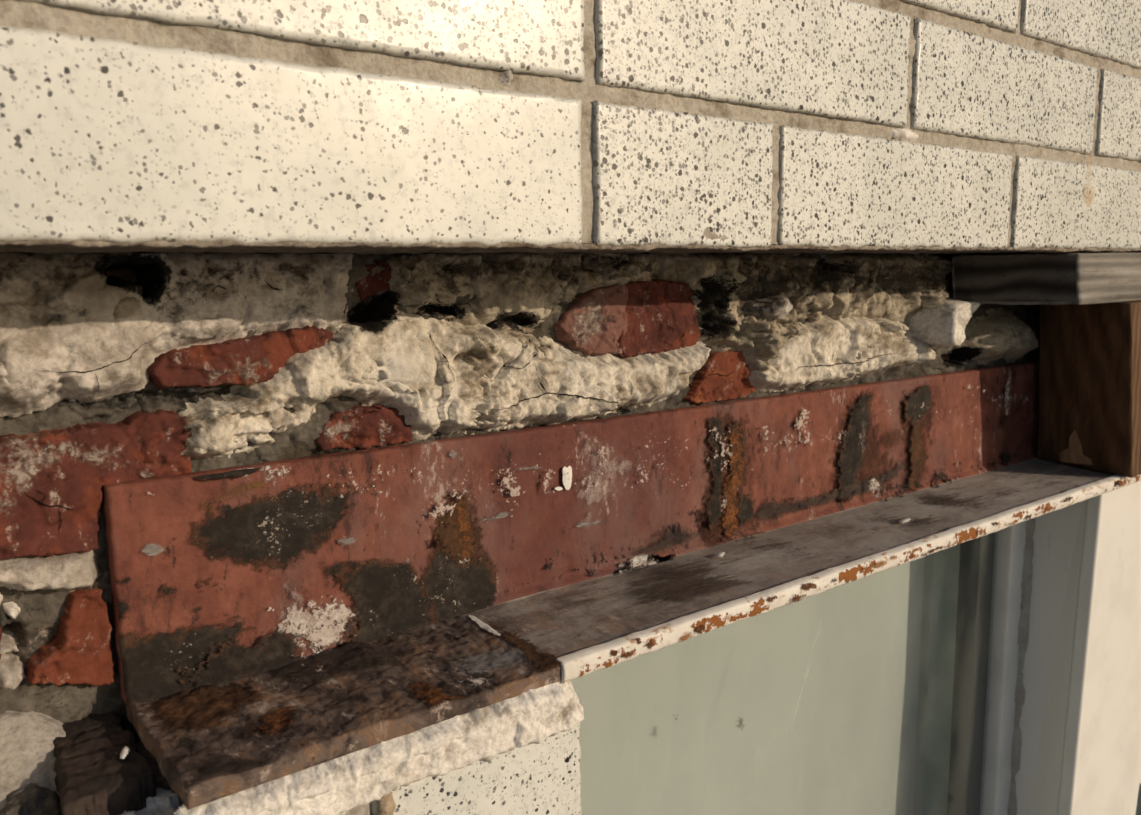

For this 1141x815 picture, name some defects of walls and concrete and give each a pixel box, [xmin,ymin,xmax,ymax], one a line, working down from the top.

spalling [703,228,730,240]
spalling [0,253,353,418]
spalling [386,253,952,372]
peeling [194,465,289,482]
rust [638,413,839,556]
rust [680,475,1140,642]
rust [139,683,306,785]
rust [405,679,471,709]
peeling [453,647,529,685]
rust [580,637,663,677]